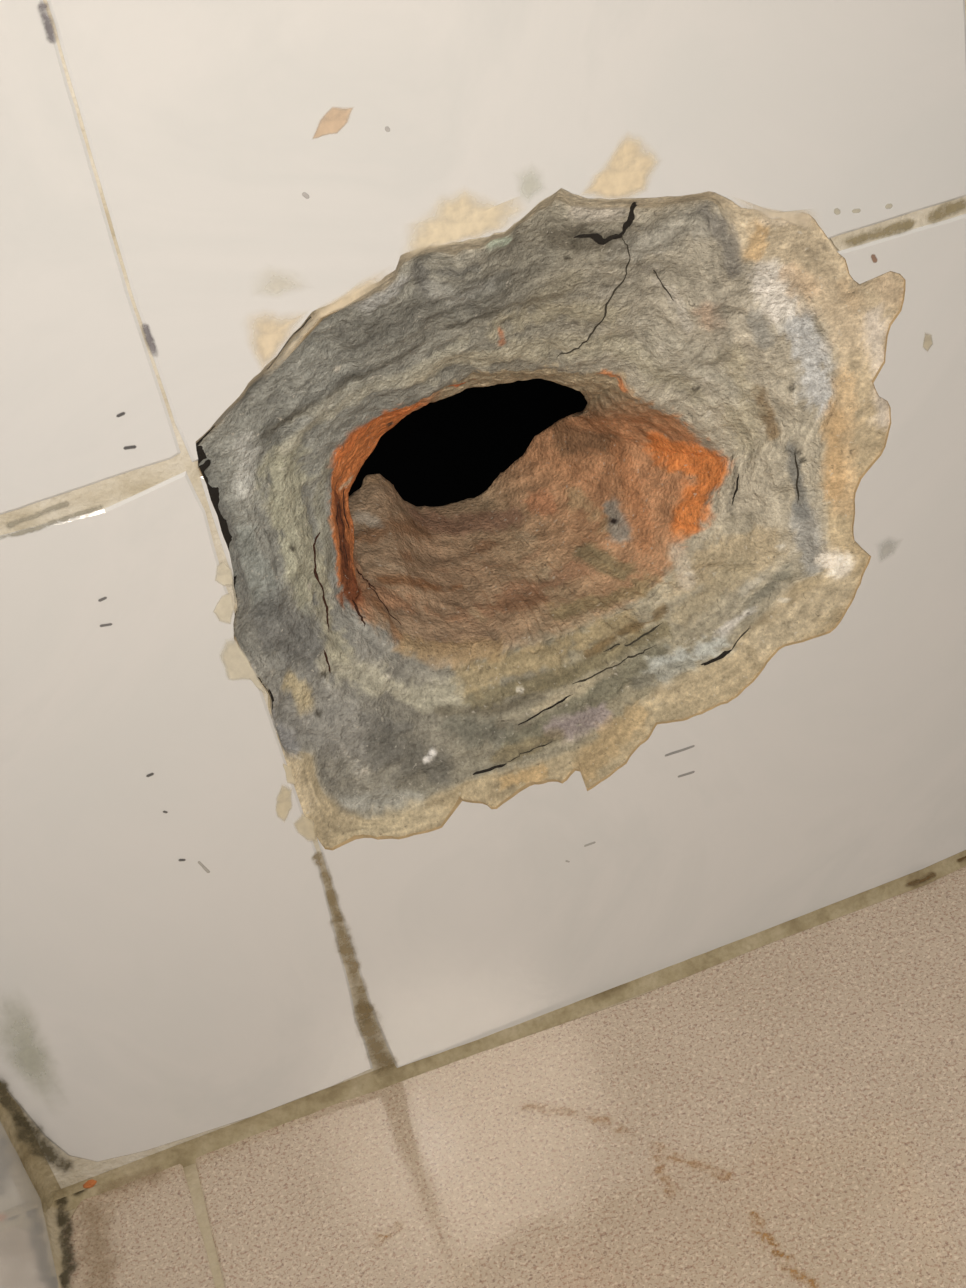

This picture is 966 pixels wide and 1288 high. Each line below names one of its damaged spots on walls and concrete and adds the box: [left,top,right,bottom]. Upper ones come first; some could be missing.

crack [557,202,674,357]
spalling [195,140,904,848]
water stain [0,1081,72,1170]
water stain [57,1189,85,1288]
rust [752,1212,816,1288]